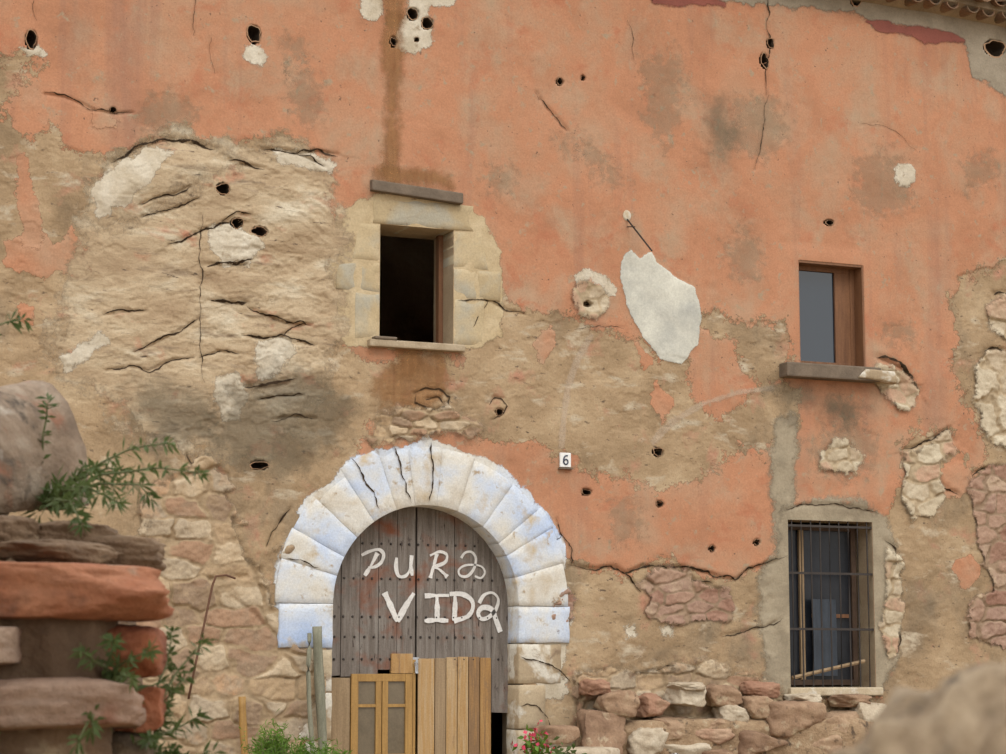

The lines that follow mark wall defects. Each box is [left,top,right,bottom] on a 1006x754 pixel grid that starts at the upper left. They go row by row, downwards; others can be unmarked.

crack [45,92,128,114]
spalling [406,7,433,42]
crack [755,3,771,165]
peeling [0,29,803,606]
crack [352,459,379,508]
crack [393,444,434,500]
peeling [869,257,1006,704]
peeling [545,552,776,726]